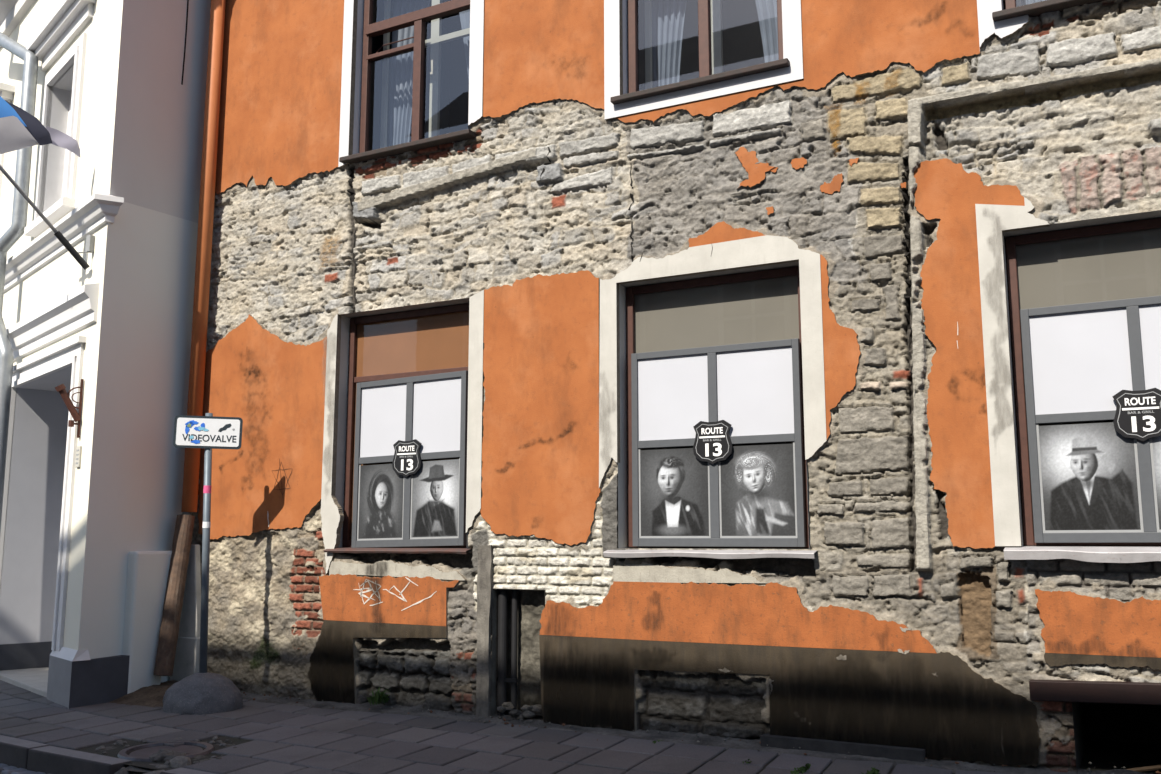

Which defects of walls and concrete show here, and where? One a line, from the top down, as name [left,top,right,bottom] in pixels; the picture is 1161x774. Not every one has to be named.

spalling [206,0,1161,715]
spalling [182,471,202,576]
damp [544,656,631,731]
spalling [1032,701,1077,773]